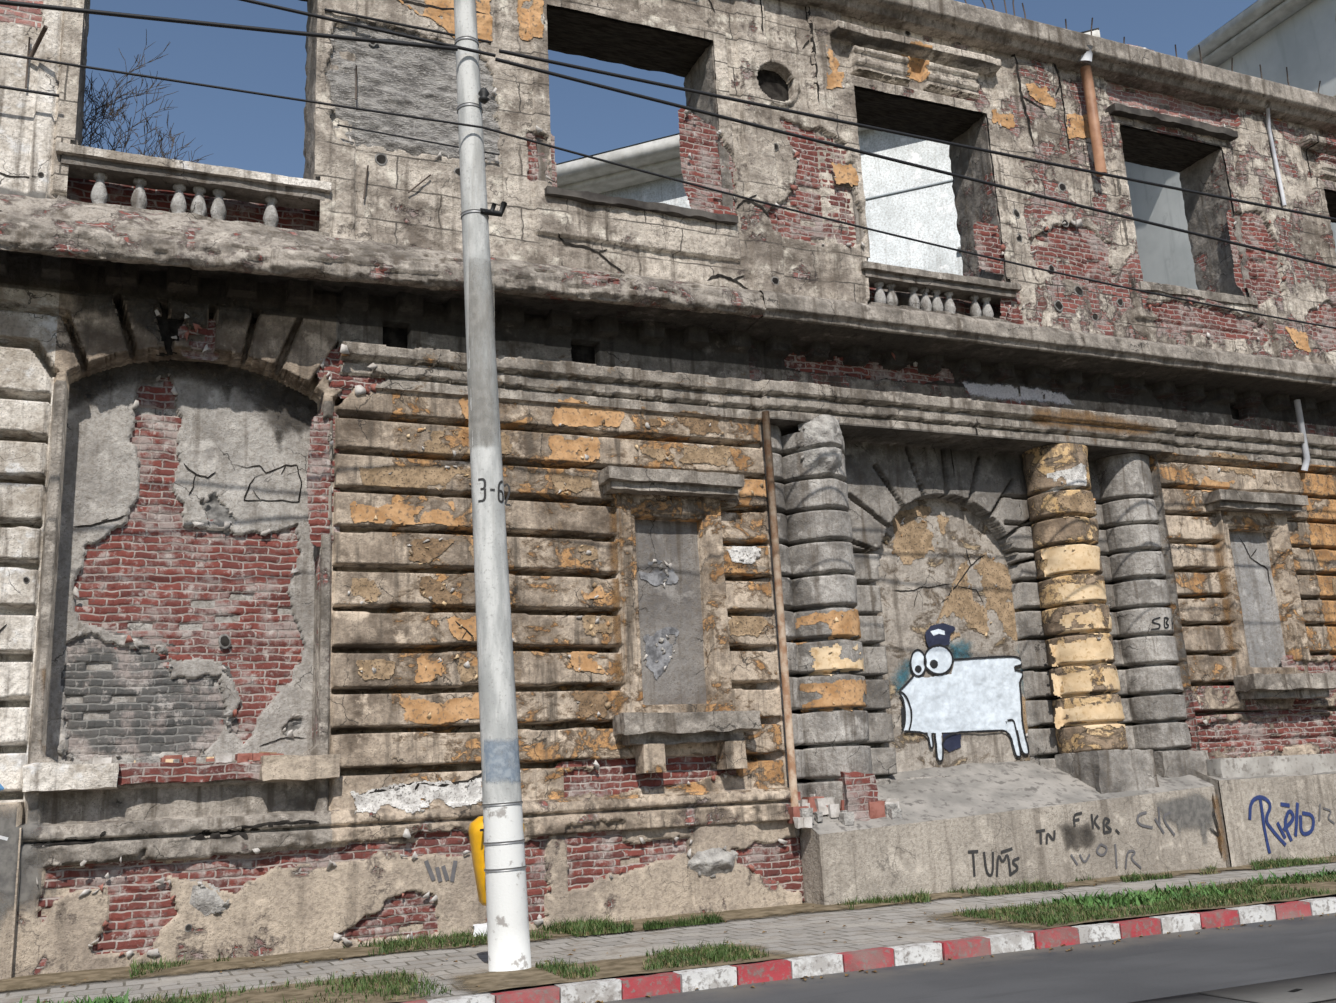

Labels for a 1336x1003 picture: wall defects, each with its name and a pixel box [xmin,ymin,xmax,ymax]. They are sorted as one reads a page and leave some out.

spalling [325,0,460,177]
spalling [476,0,502,165]
peeling [517,0,545,41]
spalling [678,108,738,216]
spalling [768,119,865,248]
crack [558,233,624,273]
spalling [973,219,1113,297]
spalling [1145,209,1336,352]
crack [184,464,302,503]
spalling [57,344,480,761]
spalling [36,778,483,958]
spalling [524,835,552,927]